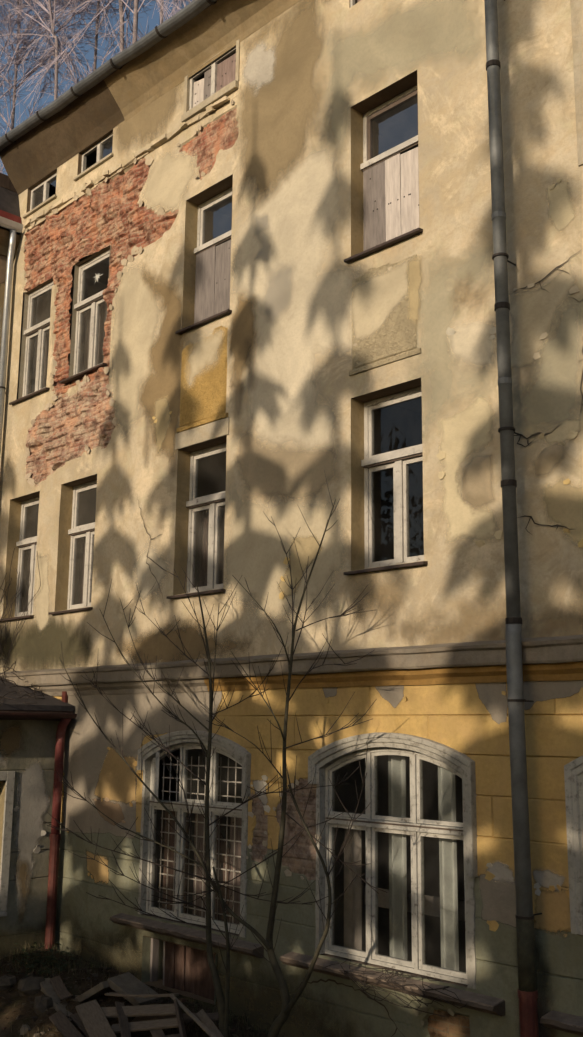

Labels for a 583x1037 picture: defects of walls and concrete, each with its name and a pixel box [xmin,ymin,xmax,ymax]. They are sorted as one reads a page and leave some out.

flaking render [176,99,239,180]
flaking render [21,156,179,487]
leakage [140,274,186,460]
crack [514,250,583,302]
crack [514,338,583,447]
crack [518,515,572,534]
leakage [0,556,92,670]
peeling [63,691,222,838]
peeling [14,763,49,910]
peeling [479,862,516,932]
peeling [533,870,571,933]
flaking render [413,1007,470,1037]